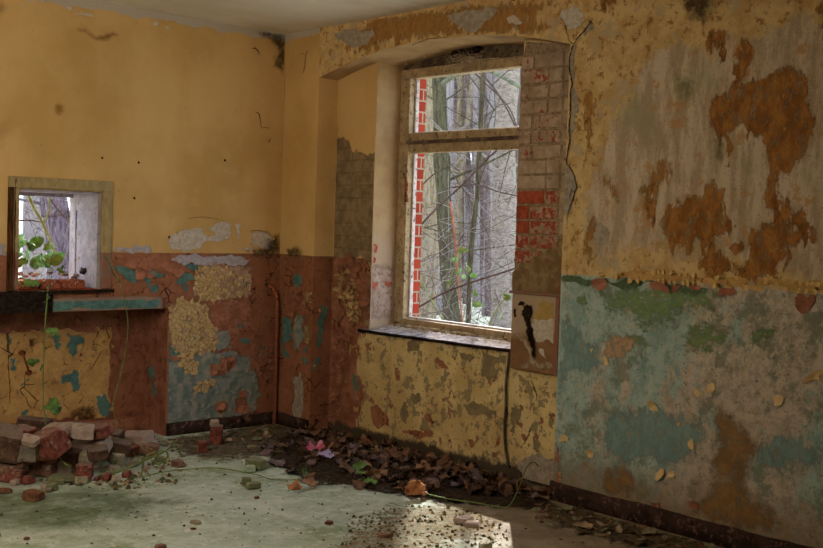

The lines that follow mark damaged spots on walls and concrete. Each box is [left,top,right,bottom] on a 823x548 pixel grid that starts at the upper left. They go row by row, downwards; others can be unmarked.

flaking render [445,6,498,33]
crack [562,19,593,217]
flaking render [512,6,594,358]
peeling [0,221,275,425]
flaking render [280,137,393,429]
peeling [591,268,823,314]
peeling [459,351,506,382]
peeling [400,393,434,439]
peeling [462,401,497,418]
spalling [492,405,568,485]
water stain [693,409,774,530]